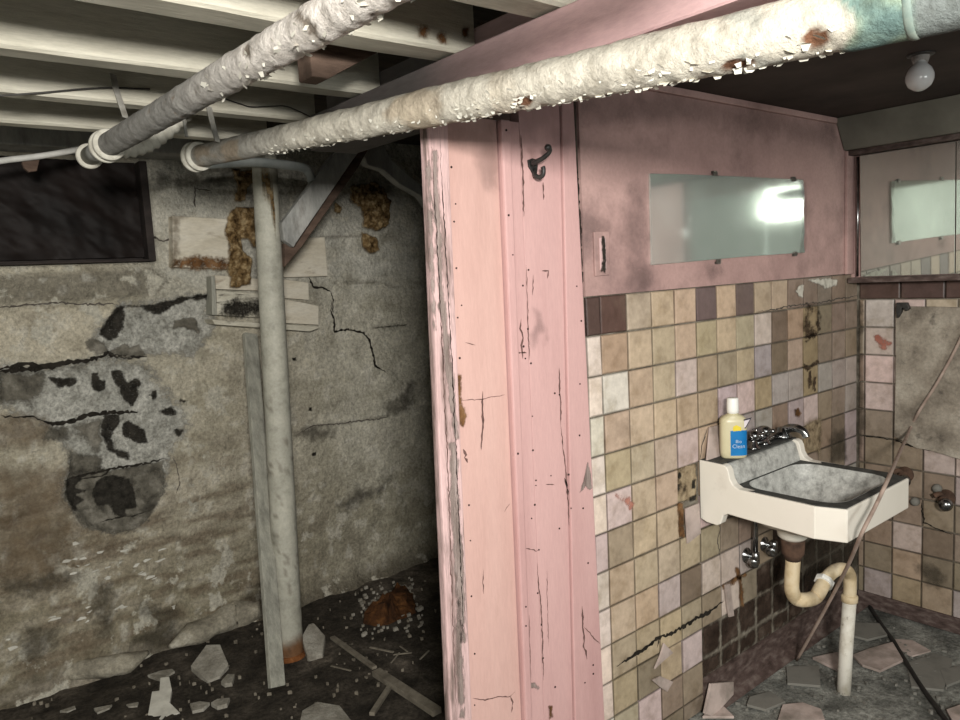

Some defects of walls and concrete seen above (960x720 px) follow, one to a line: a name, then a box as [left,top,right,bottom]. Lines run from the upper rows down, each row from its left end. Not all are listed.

peeling [200,39,285,102]
peeling [263,22,845,155]
crack [0,351,147,374]
crack [309,278,405,372]
peeling [796,278,838,298]
crack [1,410,138,426]
spalling [0,293,215,534]
crack [431,145,513,720]
peeling [675,425,720,544]
crack [617,602,723,667]